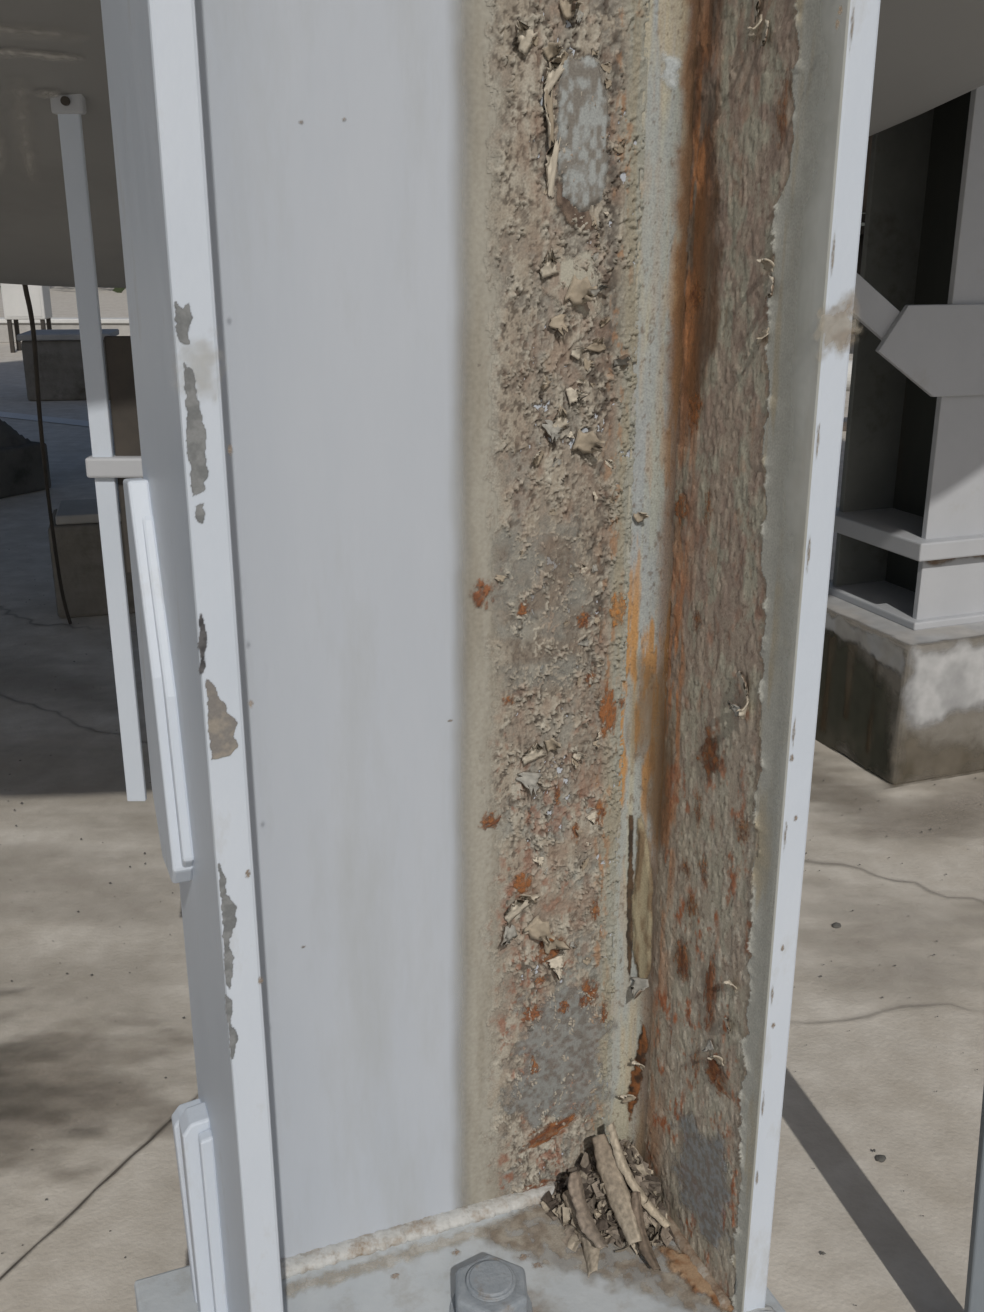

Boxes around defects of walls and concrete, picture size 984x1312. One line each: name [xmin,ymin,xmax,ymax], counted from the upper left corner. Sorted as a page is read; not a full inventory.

peeling [174,301,193,344]
peeling [183,363,209,523]
peeling [197,614,238,760]
peeling [479,0,654,1198]
rust [521,0,800,1312]
peeling [731,0,826,1312]
peeling [218,864,238,1059]